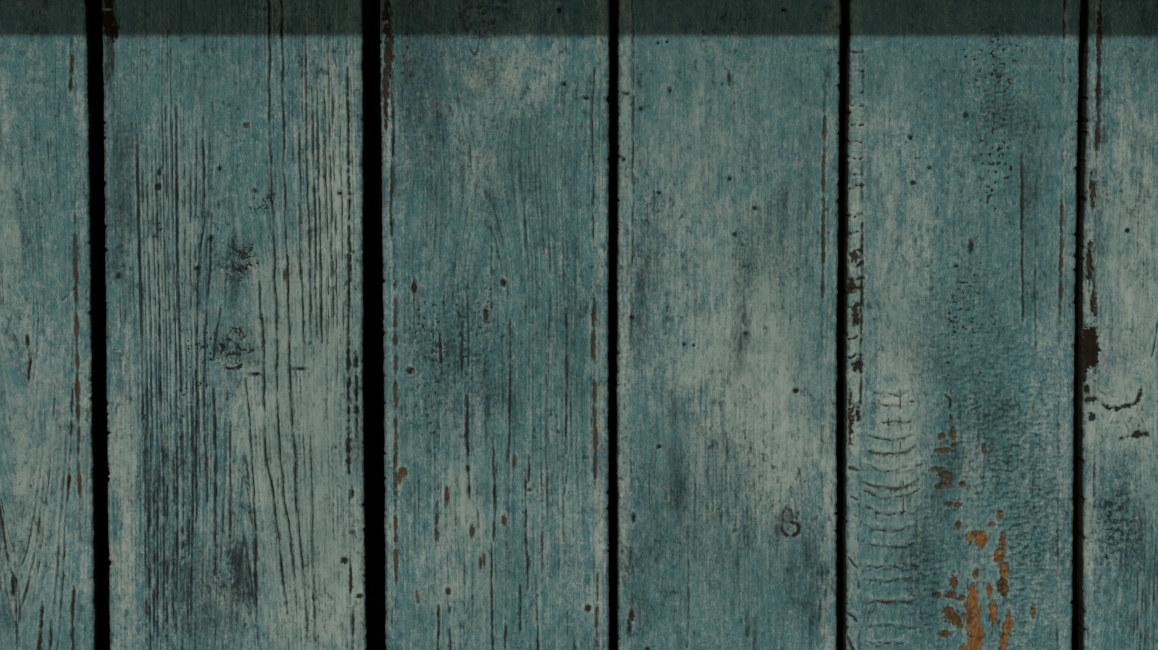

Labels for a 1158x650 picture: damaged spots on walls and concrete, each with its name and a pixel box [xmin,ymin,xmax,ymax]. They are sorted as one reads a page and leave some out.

crack [822,51,922,644]
peeling [935,431,957,452]
peeling [932,468,966,489]
peeling [910,511,1014,650]